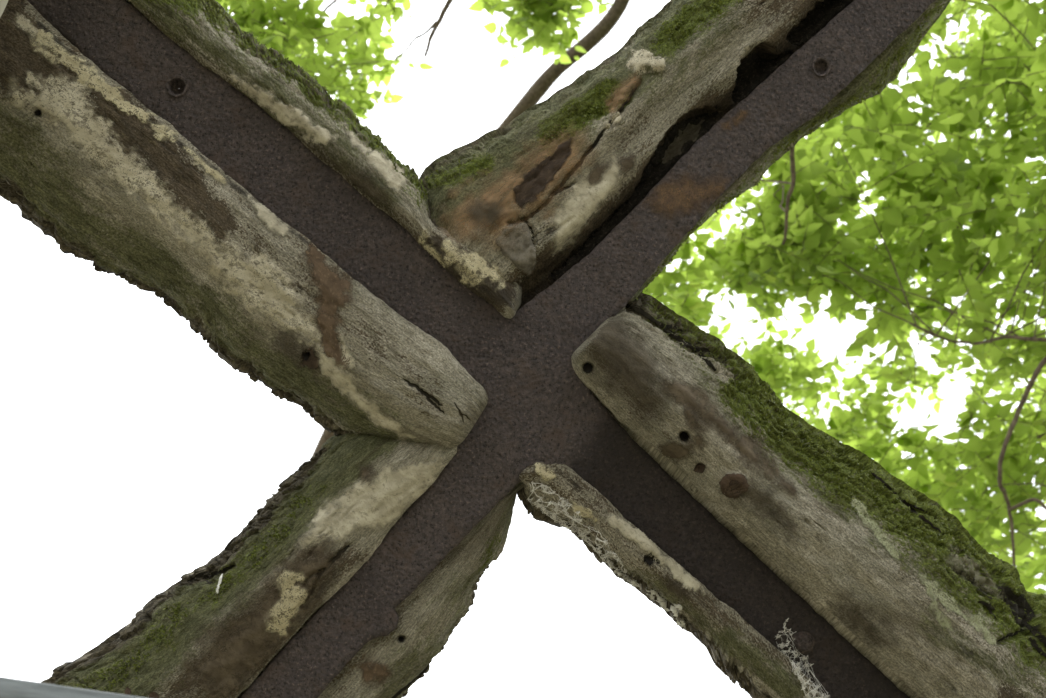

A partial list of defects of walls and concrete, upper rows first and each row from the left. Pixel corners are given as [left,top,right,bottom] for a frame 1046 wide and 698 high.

crack [512,81,641,244]
crack [404,379,470,422]
rust [719,473,749,499]
crack [958,570,1046,657]